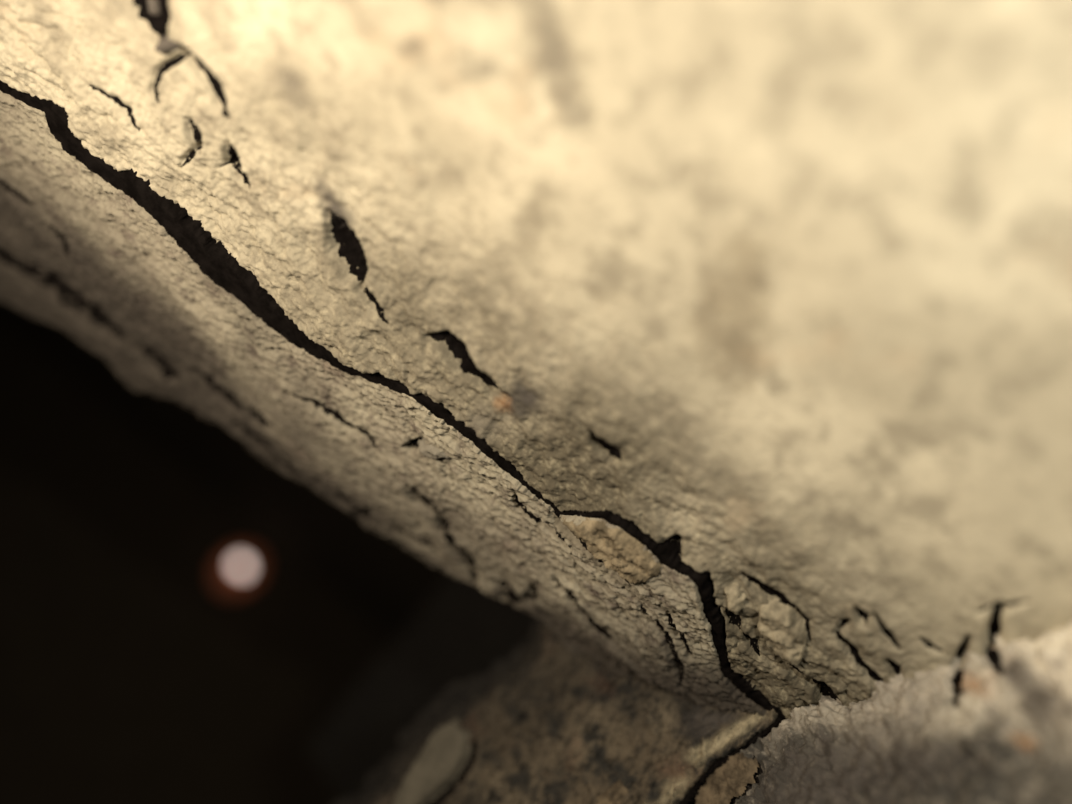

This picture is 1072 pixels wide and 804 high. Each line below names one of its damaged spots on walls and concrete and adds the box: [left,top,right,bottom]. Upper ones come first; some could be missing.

crack [88,0,251,188]
crack [0,80,839,804]